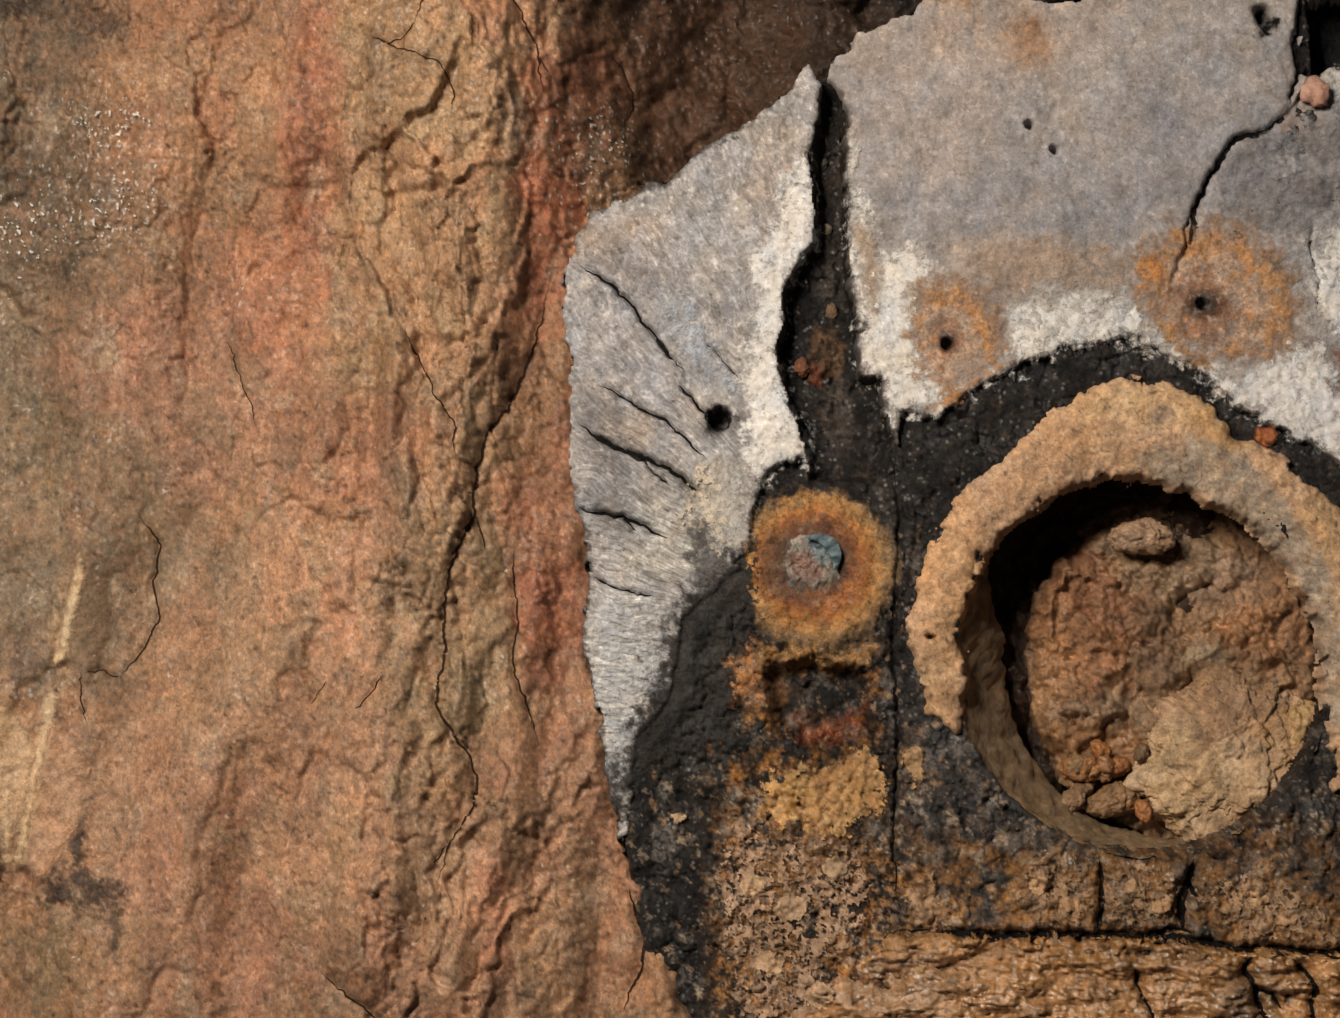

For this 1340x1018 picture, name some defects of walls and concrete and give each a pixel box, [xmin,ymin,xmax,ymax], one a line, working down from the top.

crack [373,0,455,104]
crack [513,0,550,86]
crack [1185,48,1300,247]
crack [578,266,707,499]
rust [900,273,1013,410]
damp [651,132,1340,608]
rust [1134,215,1309,368]
crack [404,276,551,884]
crack [578,506,667,538]
crack [594,577,654,597]
rust [723,489,902,709]
damp [585,592,670,813]